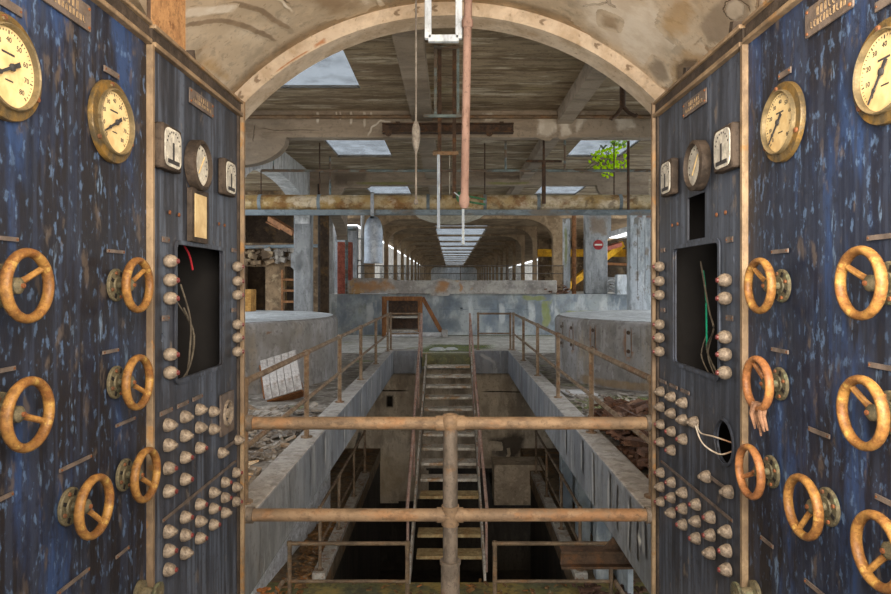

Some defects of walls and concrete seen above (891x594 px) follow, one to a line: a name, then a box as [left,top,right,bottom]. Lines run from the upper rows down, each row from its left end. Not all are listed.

crack [277,0,295,14]